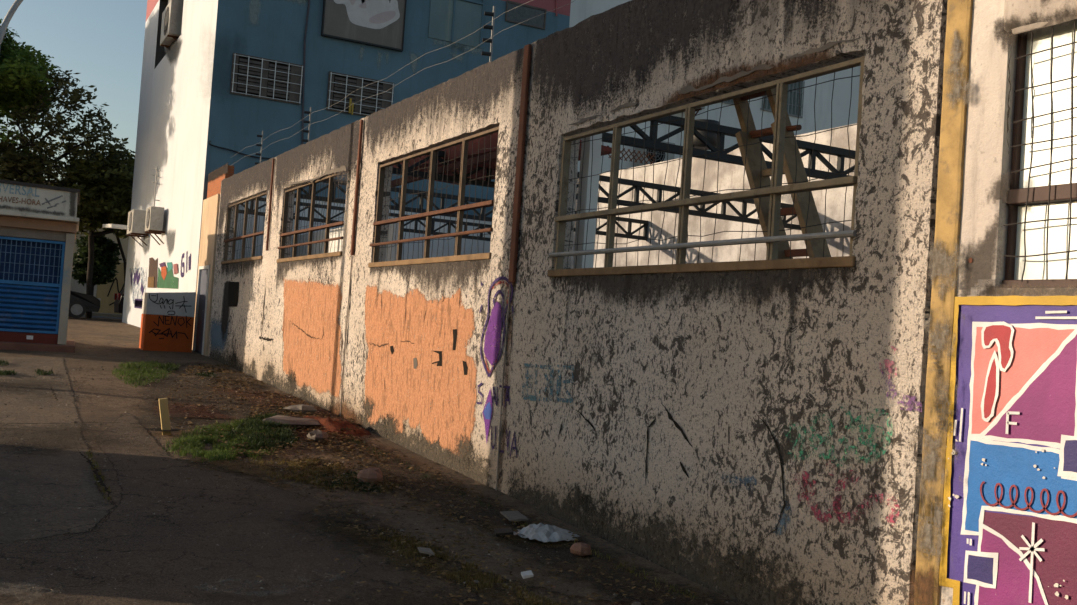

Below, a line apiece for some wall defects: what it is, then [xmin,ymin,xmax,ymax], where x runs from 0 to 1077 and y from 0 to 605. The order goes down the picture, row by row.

water stain [784,0,837,46]
water stain [208,0,756,241]
water stain [209,264,335,412]
crack [8,383,144,540]
water stain [352,397,491,486]
water stain [507,466,843,605]